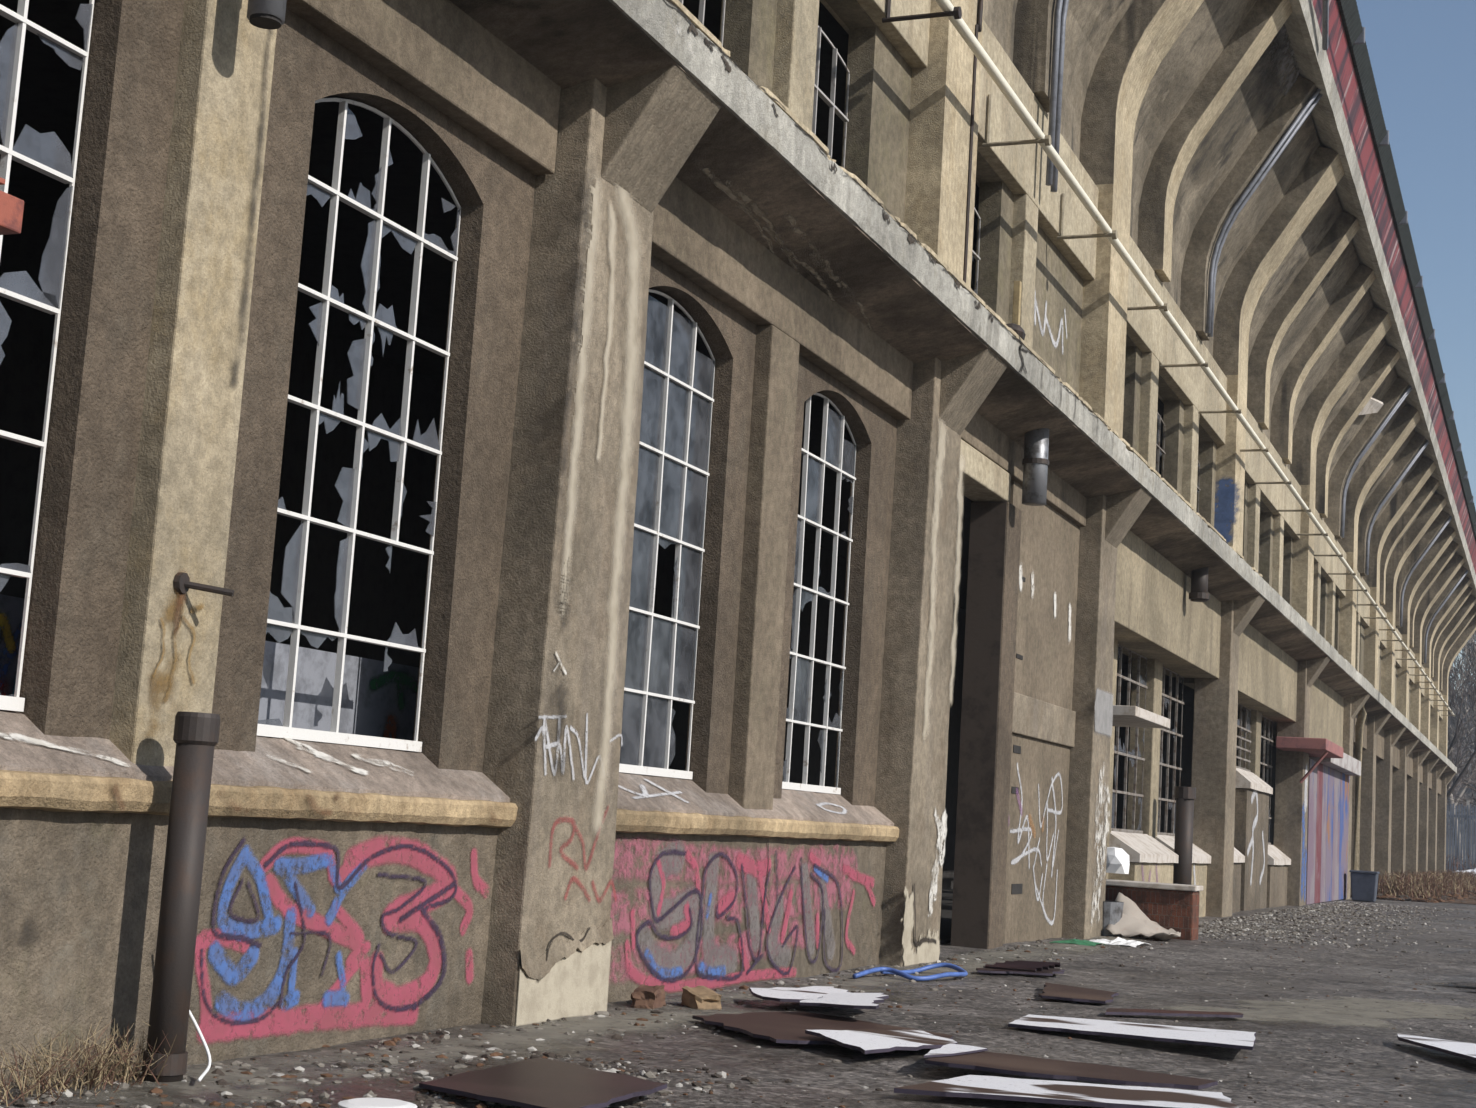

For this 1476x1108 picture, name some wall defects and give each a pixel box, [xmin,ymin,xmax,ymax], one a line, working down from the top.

water stain [561,182,638,830]
flaking render [901,810,947,967]
flaking render [516,918,614,1026]
spalling [631,985,666,1010]